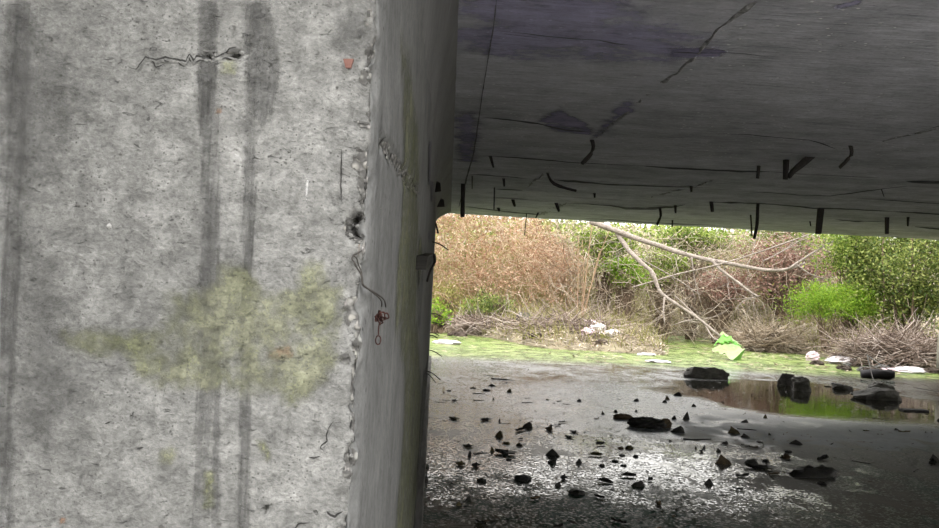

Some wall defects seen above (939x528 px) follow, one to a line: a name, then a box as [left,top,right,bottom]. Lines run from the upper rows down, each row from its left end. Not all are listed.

crack [128,47,249,74]
damp [198,4,216,133]
damp [247,1,279,126]
damp [457,0,725,61]
crack [459,0,939,230]
damp [200,198,220,437]